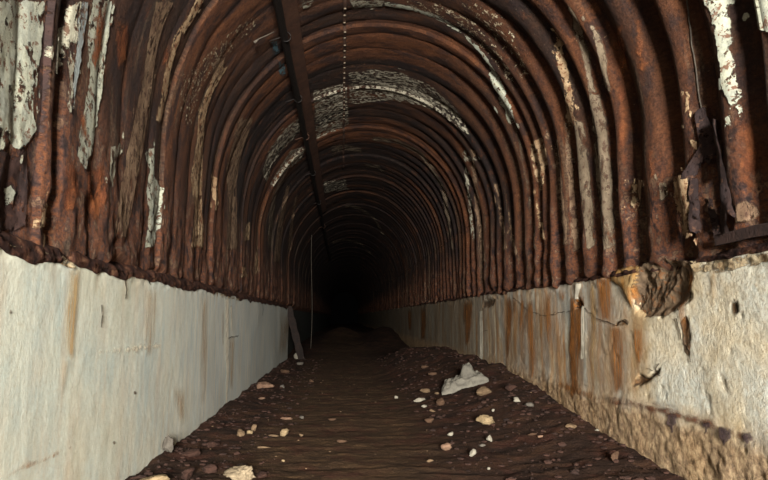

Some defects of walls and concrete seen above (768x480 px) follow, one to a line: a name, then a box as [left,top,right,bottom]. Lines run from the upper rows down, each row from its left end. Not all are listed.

peeling [0,0,115,169]
corrosion [91,6,106,67]
peeling [105,0,203,248]
peeling [350,0,527,130]
peeling [520,7,642,250]
peeling [703,0,743,234]
corrosion [87,168,107,219]
corrosion [736,202,758,222]
crack [513,298,628,326]
corrosion [559,278,611,399]
spalling [631,254,768,356]
corrosion [630,401,714,429]